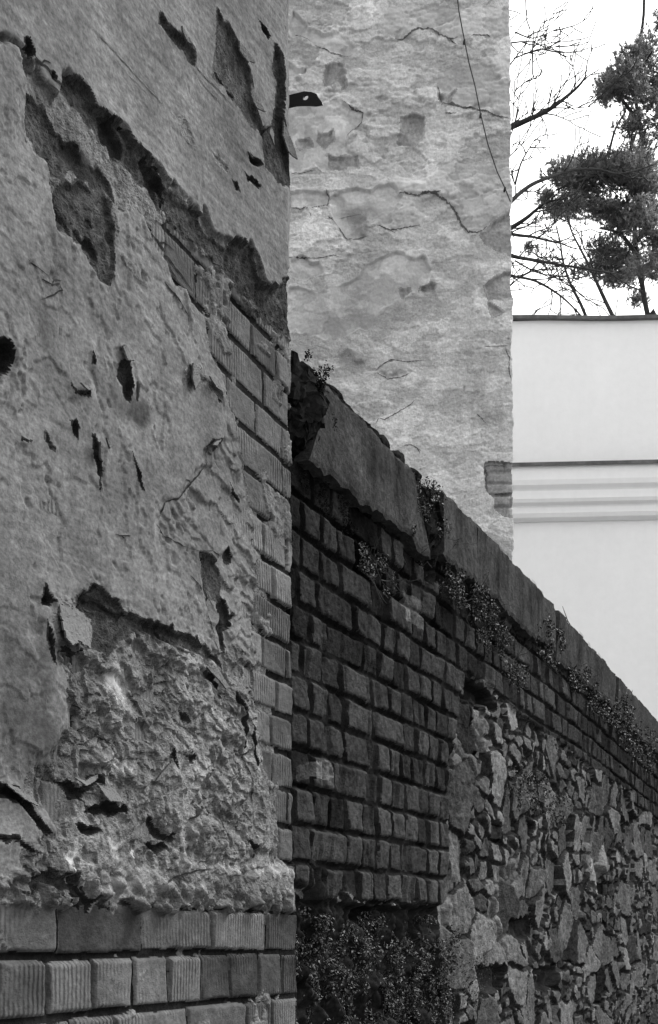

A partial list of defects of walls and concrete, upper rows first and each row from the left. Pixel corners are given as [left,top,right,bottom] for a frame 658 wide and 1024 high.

peeling [158,10,197,67]
crack [395,27,490,44]
crack [438,87,508,118]
flaking render [24,69,437,341]
crack [399,190,487,233]
flaking render [0,335,16,376]
peeling [116,345,141,403]
peeling [69,418,114,492]
crack [156,451,219,654]
flaking render [41,582,235,689]
flaking render [57,773,129,818]
flaking render [22,864,110,913]